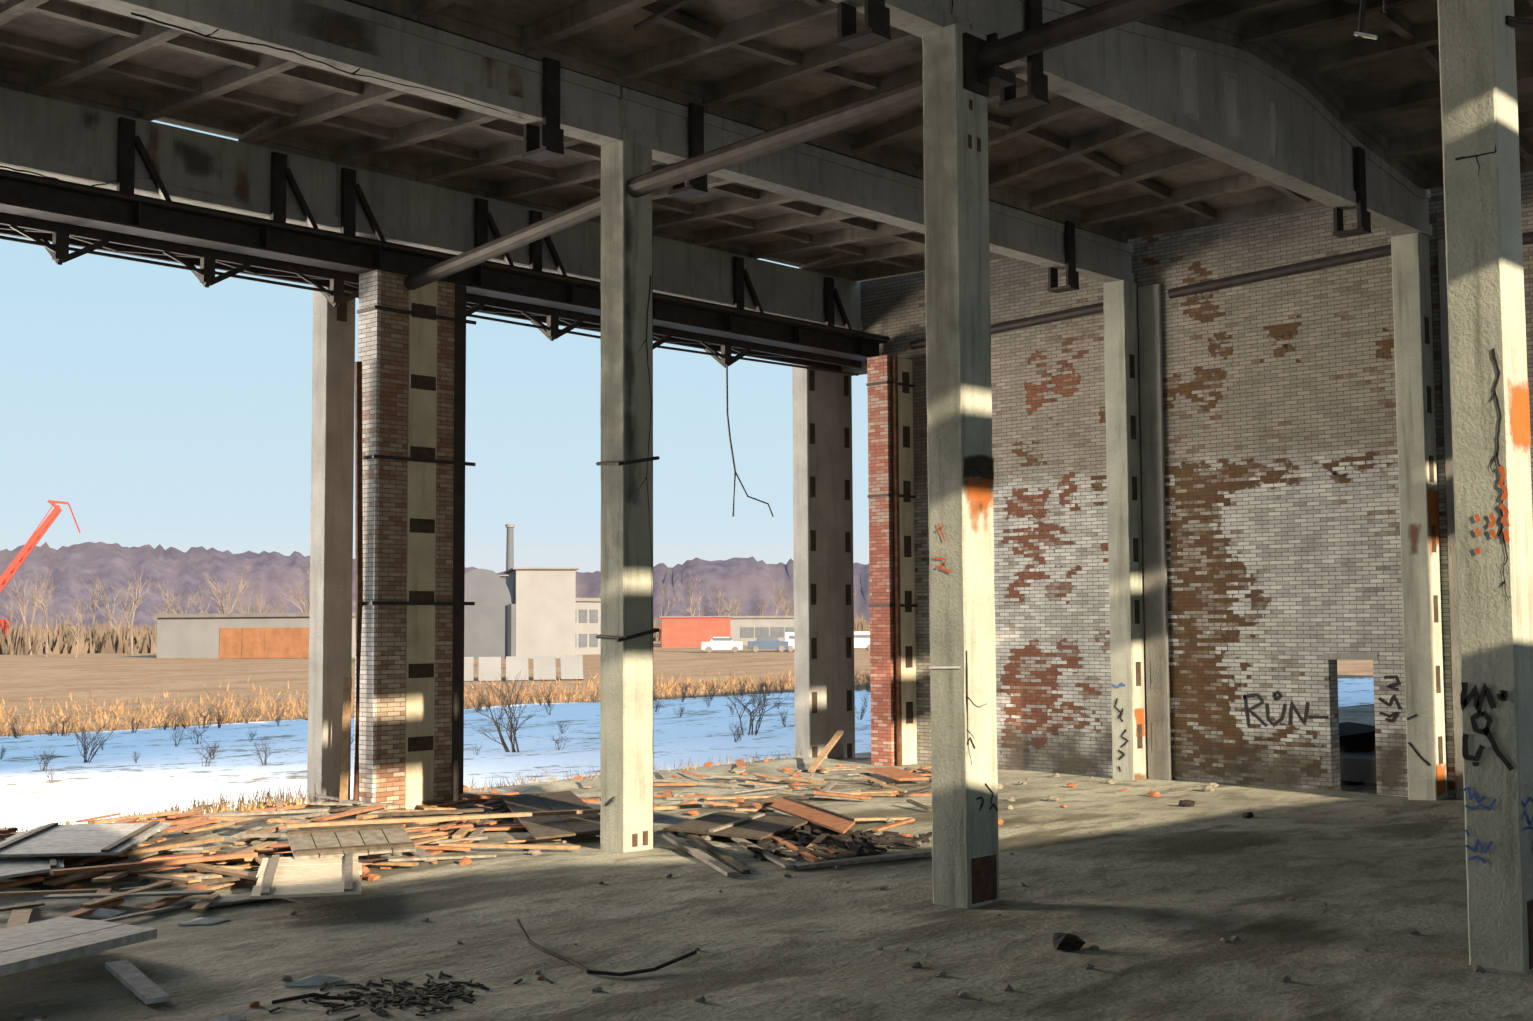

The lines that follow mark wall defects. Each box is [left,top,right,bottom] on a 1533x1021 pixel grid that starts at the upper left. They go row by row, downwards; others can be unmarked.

peeling [1024,350,1081,425]
rust [963,473,994,527]
peeling [1012,441,1047,466]
peeling [1001,472,1107,604]
crack [1489,348,1509,600]
peeling [1000,638,1102,753]
peeling [1095,629,1110,653]
peeling [1165,452,1393,789]